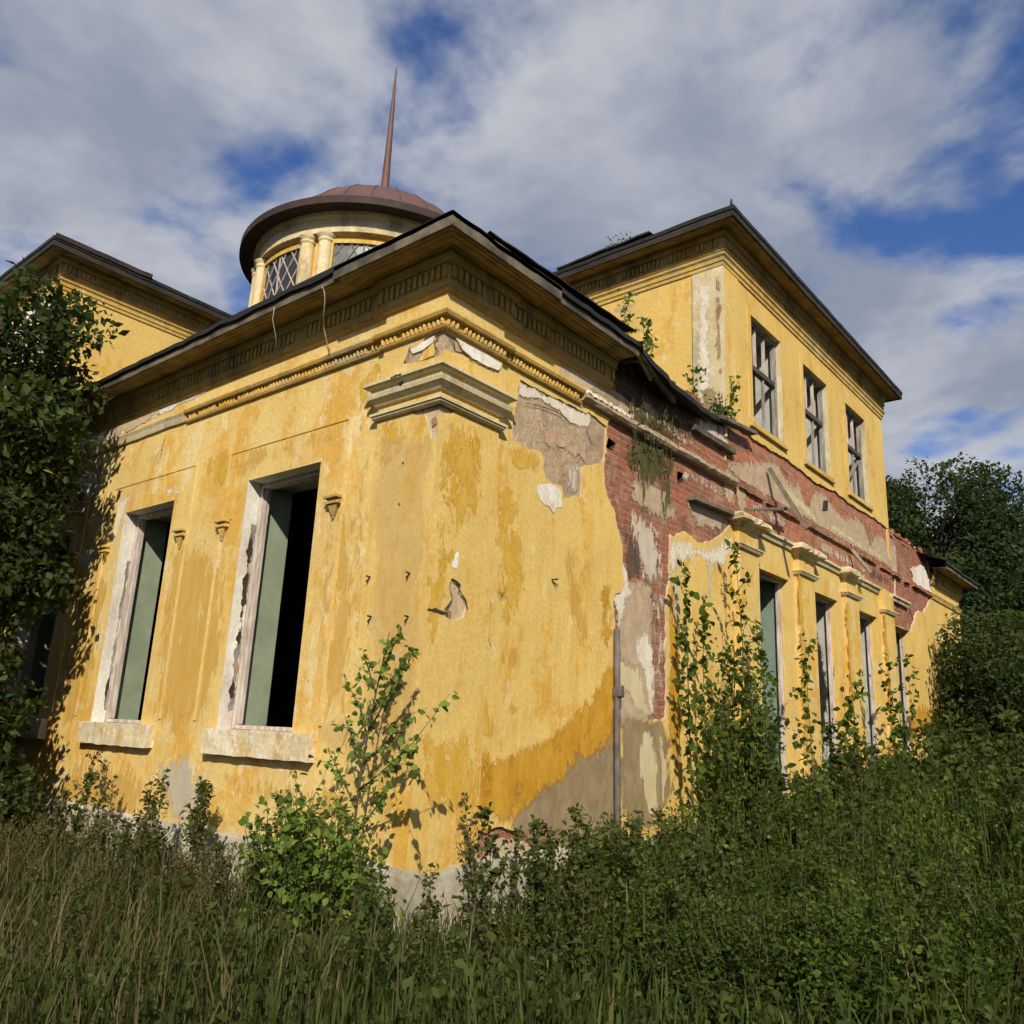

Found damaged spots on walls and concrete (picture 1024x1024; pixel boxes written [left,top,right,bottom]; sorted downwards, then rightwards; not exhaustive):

spalling [404,329,502,373]
peeling [232,538,253,669]
spalling [428,552,468,621]
flaking render [513,361,933,723]